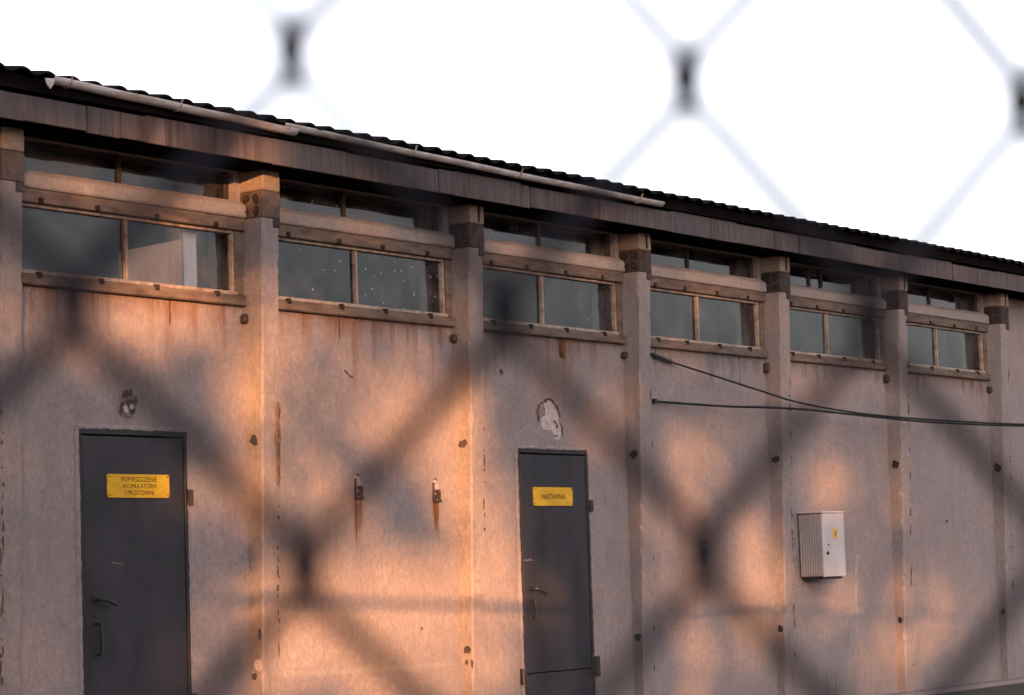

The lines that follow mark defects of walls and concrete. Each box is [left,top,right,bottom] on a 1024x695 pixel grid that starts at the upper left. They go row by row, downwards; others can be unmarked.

spalling [117,390,138,419]
flaking render [537,398,563,440]